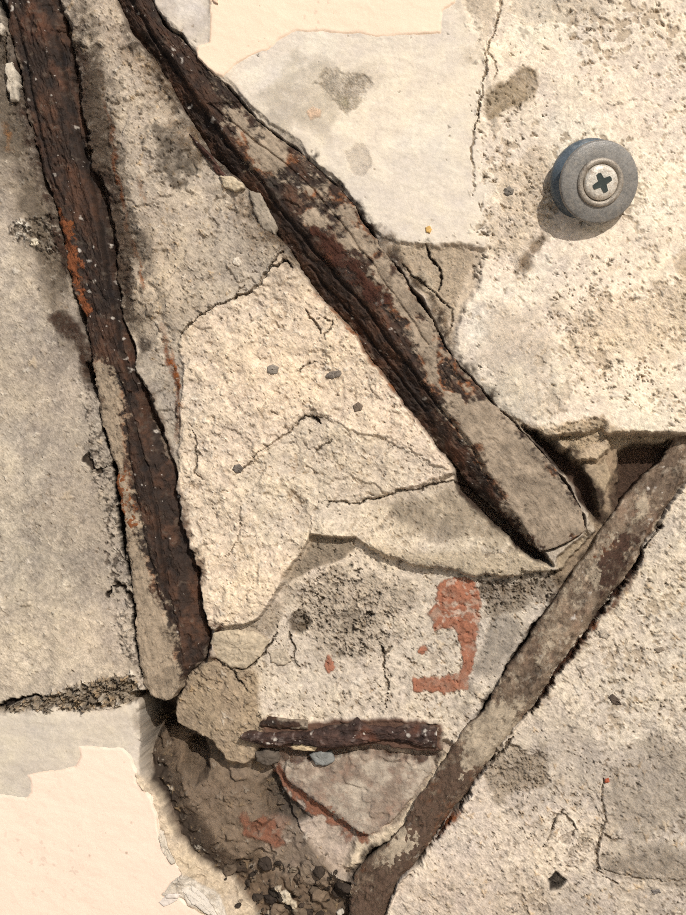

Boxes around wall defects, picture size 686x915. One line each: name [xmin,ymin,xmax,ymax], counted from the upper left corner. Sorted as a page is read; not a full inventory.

crack [477,1,502,118]
corrosion [332,181,376,238]
crack [192,252,288,323]
crack [402,244,453,327]
corrosion [48,312,93,382]
corrosion [454,464,546,560]
corrosion [526,430,665,524]
crack [0,694,46,706]
corrosion [240,716,439,765]
spalling [275,766,368,844]
peeling [158,829,176,865]
peeling [158,875,226,915]